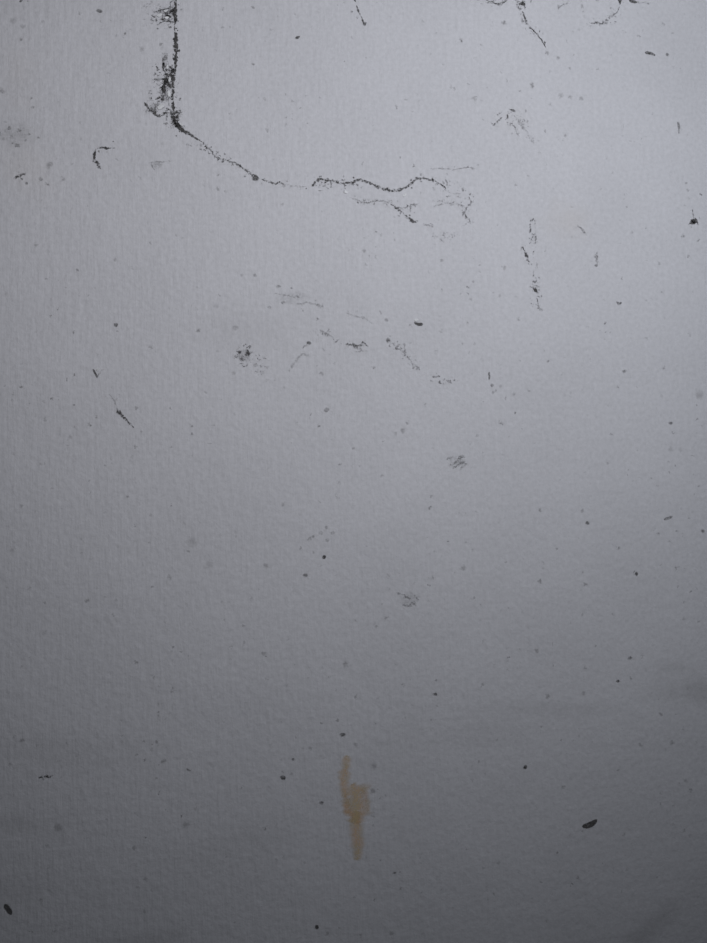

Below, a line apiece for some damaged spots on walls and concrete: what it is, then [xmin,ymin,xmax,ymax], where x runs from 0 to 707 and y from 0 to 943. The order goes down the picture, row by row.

crack [493,0,546,46]
crack [144,0,278,185]
crack [306,177,448,223]